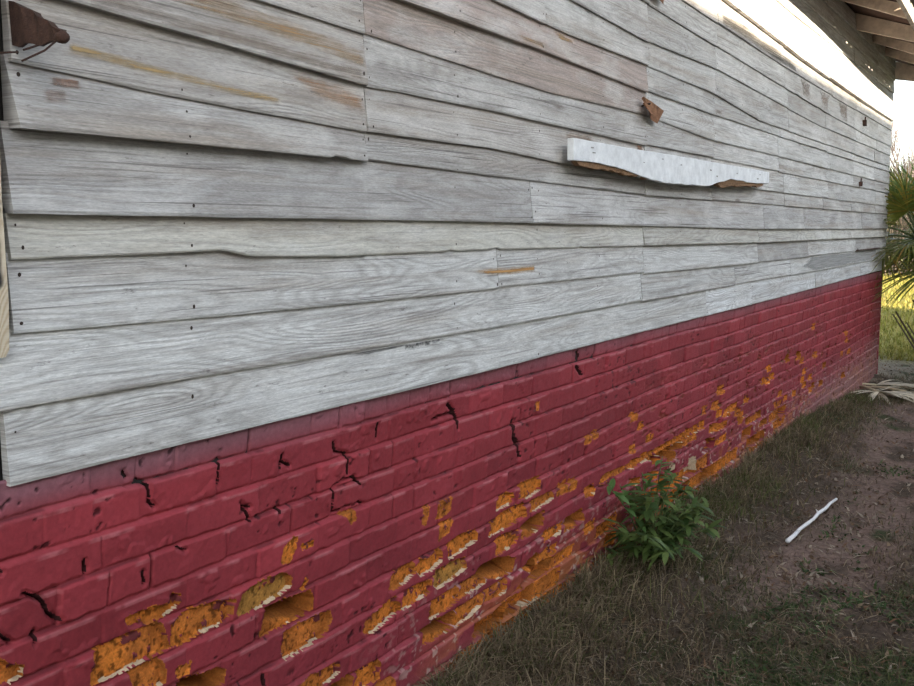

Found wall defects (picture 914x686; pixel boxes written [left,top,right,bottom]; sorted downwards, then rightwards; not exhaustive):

crack [433,402,459,429]
crack [509,419,521,457]
crack [122,470,155,507]
crack [278,453,290,469]
crack [330,441,362,510]
crack [240,505,251,522]
spalling [363,350,826,674]
crack [0,591,62,643]
spalling [90,536,314,686]
spalling [281,610,333,661]
spalling [0,658,24,685]
spalling [299,658,396,686]